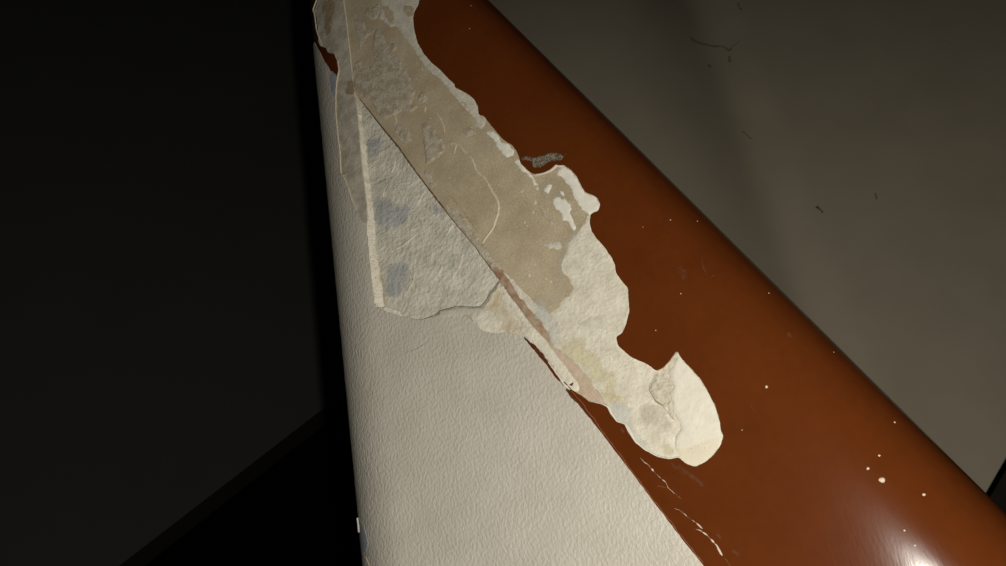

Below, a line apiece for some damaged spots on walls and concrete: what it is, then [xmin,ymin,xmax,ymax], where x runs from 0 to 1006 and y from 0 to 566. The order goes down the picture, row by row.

peeling [312,0,723,467]
crack [524,336,729,564]